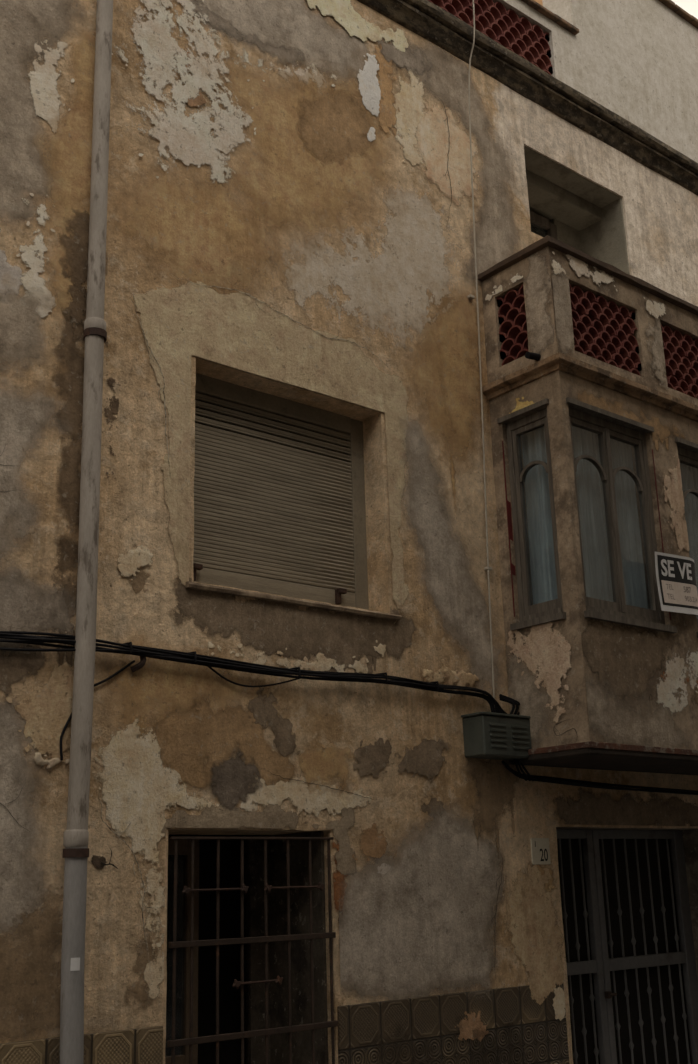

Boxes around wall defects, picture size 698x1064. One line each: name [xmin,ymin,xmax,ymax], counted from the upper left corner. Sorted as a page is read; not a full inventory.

peeling [28,39,75,133]
peeling [112,0,256,184]
damp [129,40,432,295]
peeling [307,0,409,142]
peeling [392,69,479,206]
peeling [16,193,57,318]
damp [0,32,96,697]
damp [170,577,417,674]
peeling [506,622,572,723]
peeling [656,648,698,715]
peeling [95,701,371,999]